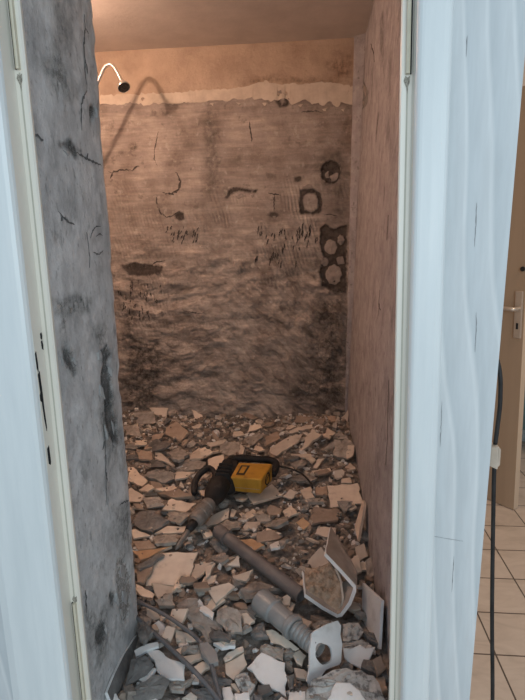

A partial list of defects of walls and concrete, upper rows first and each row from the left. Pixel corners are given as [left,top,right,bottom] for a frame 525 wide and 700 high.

crack [81,15,89,128]
peeling [89,80,353,118]
crack [76,152,138,179]
crack [156,172,181,218]
spalling [295,175,322,214]
spalling [321,160,341,184]
crack [58,211,103,268]
spalling [257,223,347,292]
spalling [118,262,163,321]
damp [126,342,164,408]